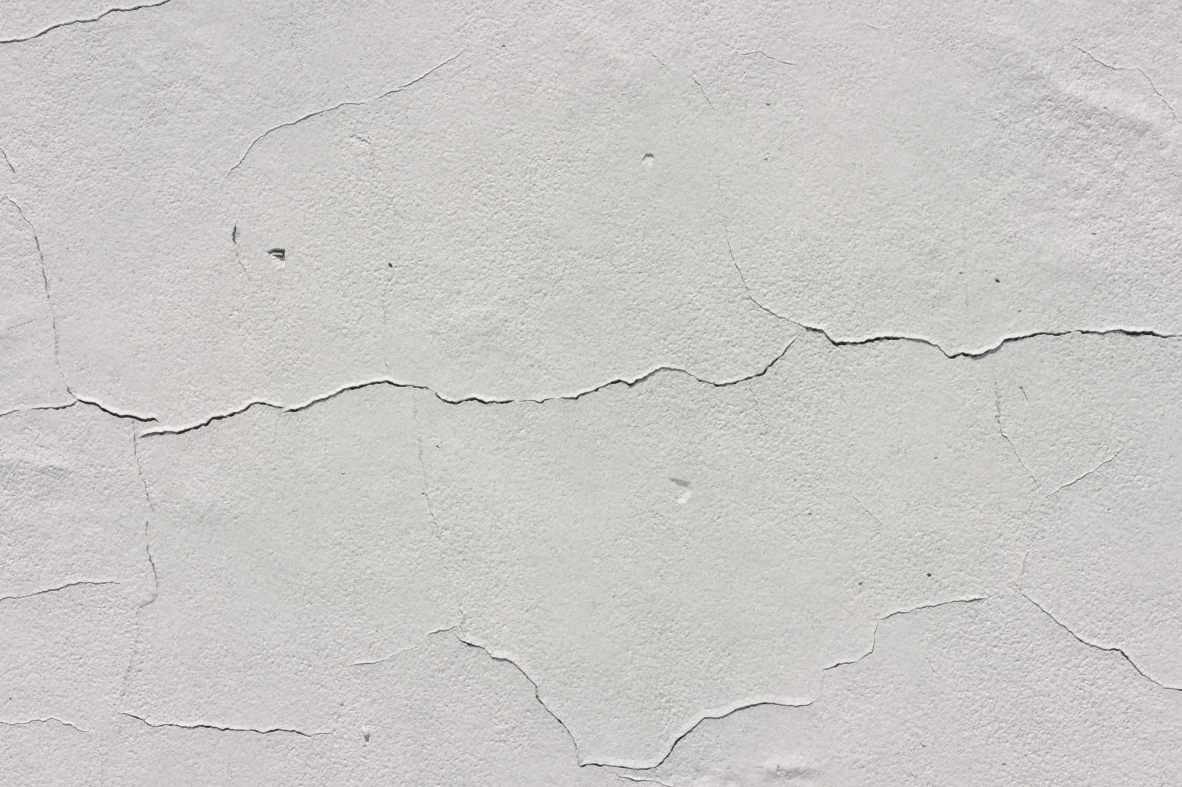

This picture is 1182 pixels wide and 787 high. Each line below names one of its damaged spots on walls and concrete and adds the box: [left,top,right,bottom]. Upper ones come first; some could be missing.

crack [0,0,176,47]
crack [197,42,473,189]
crack [687,71,717,114]
crack [0,125,1182,740]